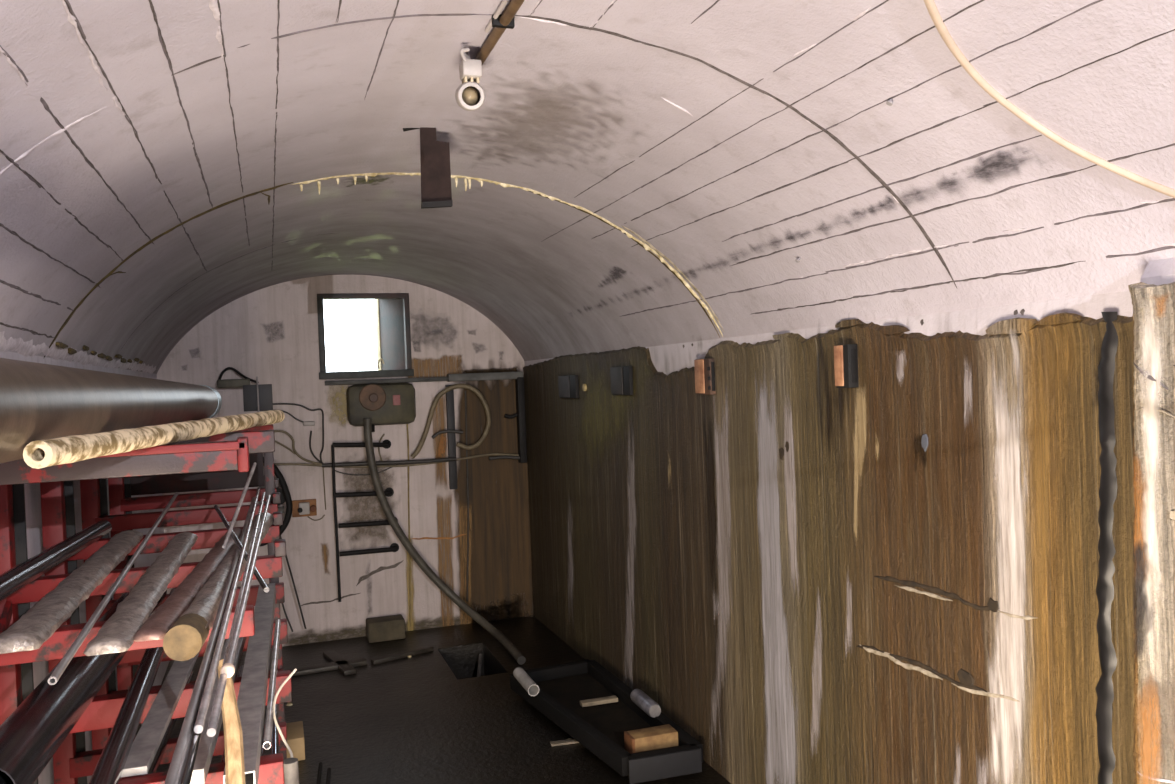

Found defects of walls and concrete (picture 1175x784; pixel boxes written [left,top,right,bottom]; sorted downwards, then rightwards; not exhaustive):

water stain [291,172,421,195]
crack [0,0,1175,357]
water stain [405,175,1175,784]
crack [874,576,1038,620]
water stain [287,627,366,646]
crack [856,644,1020,702]